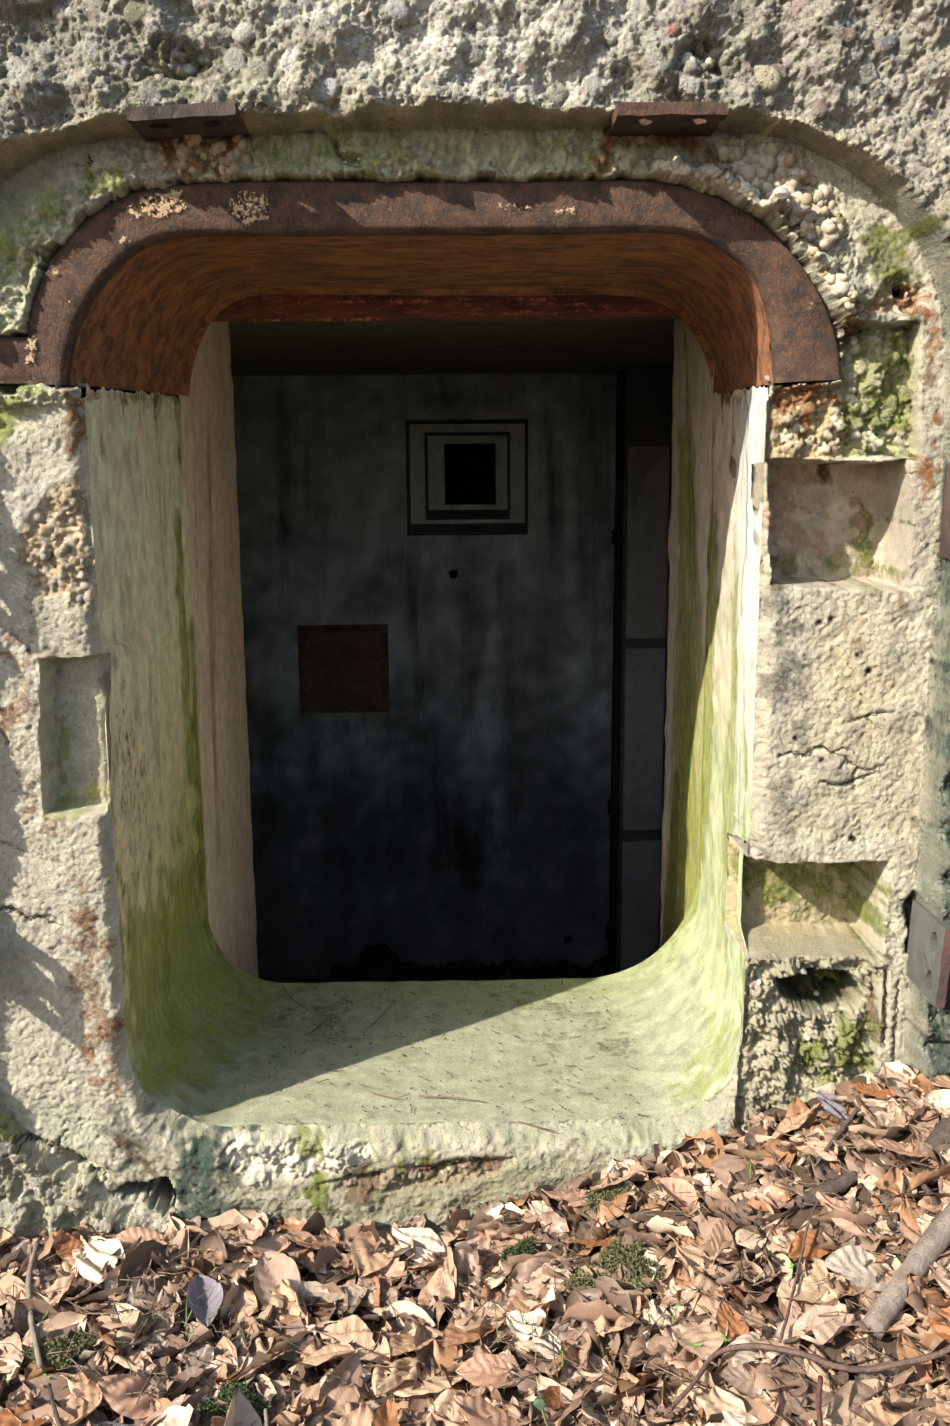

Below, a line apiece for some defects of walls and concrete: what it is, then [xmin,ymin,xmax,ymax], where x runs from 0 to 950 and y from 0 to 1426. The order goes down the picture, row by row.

spalling [650,116,931,463]
rust [841,302,869,345]
rust [886,288,941,507]
spalling [10,479,97,619]
damp [712,395,777,615]
damp [661,645,704,946]
crack [779,711,892,789]
crack [0,906,60,925]
rust [19,770,124,1104]
damp [726,1020,742,1085]
spalling [740,924,883,1104]
damp [176,1138,215,1219]